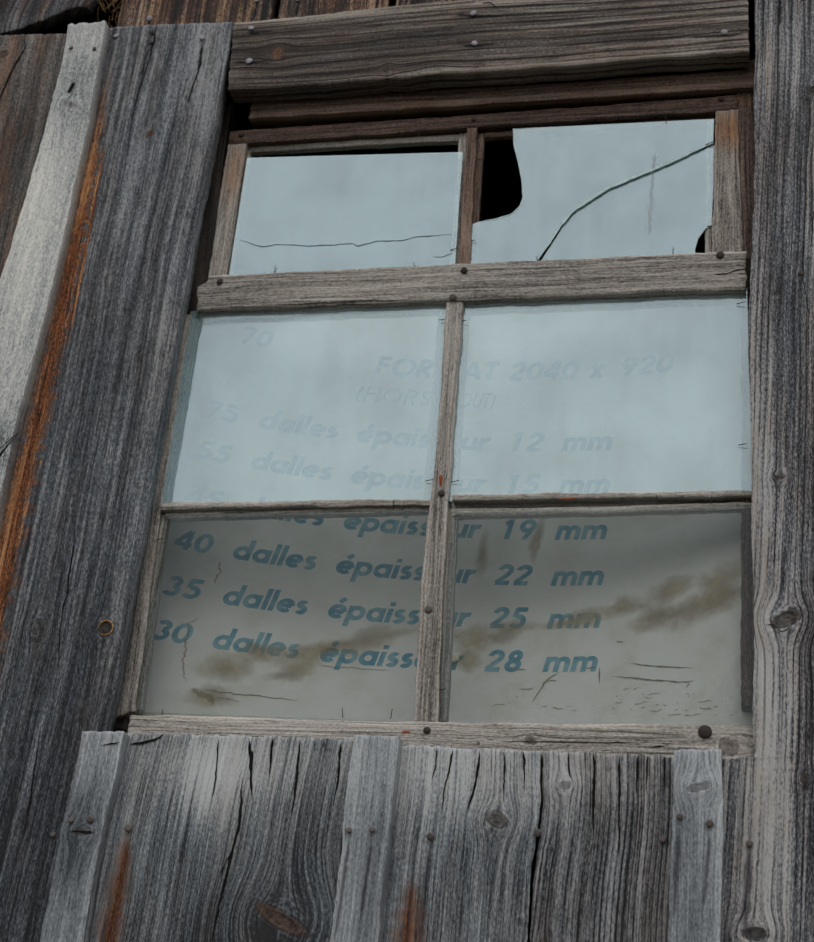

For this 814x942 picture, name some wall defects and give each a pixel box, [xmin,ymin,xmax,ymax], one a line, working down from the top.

crack [211,740,274,939]
crack [291,741,342,816]